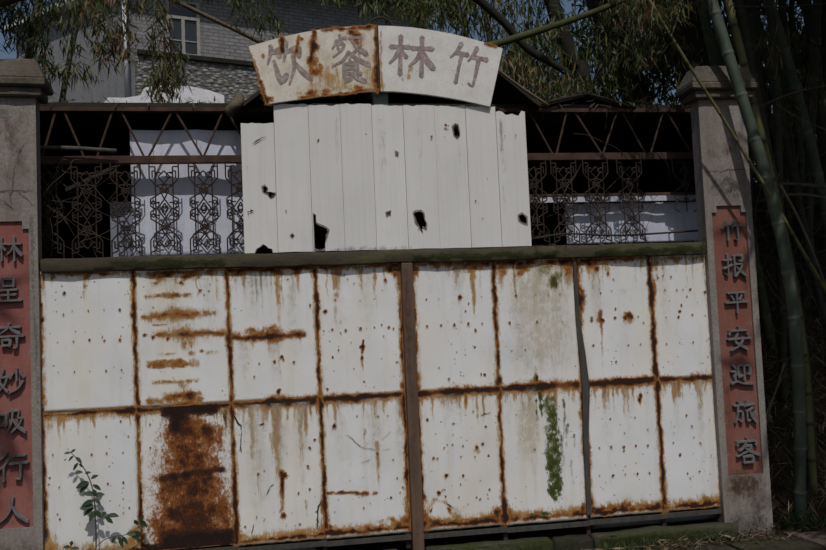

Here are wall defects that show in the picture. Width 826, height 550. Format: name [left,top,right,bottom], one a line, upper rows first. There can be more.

rust [250,52,274,105]
rust [278,24,384,99]
rust [40,263,411,550]
rust [412,256,720,530]